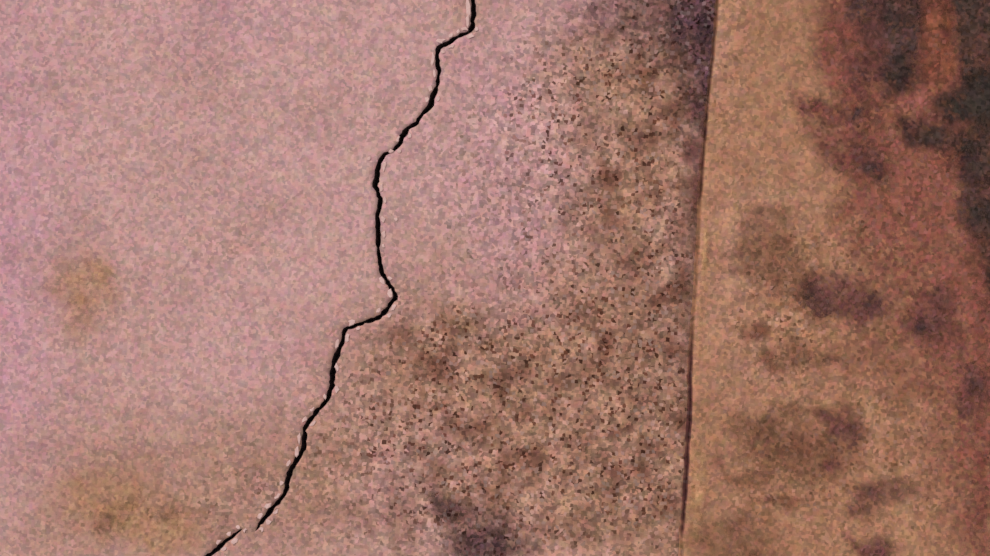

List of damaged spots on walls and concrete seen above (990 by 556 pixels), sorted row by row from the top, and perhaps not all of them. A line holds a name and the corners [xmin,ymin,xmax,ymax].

damp [622,0,715,209]
damp [848,0,929,92]
damp [899,0,990,290]
crack [205,0,479,556]
damp [739,238,886,324]
damp [434,498,518,556]